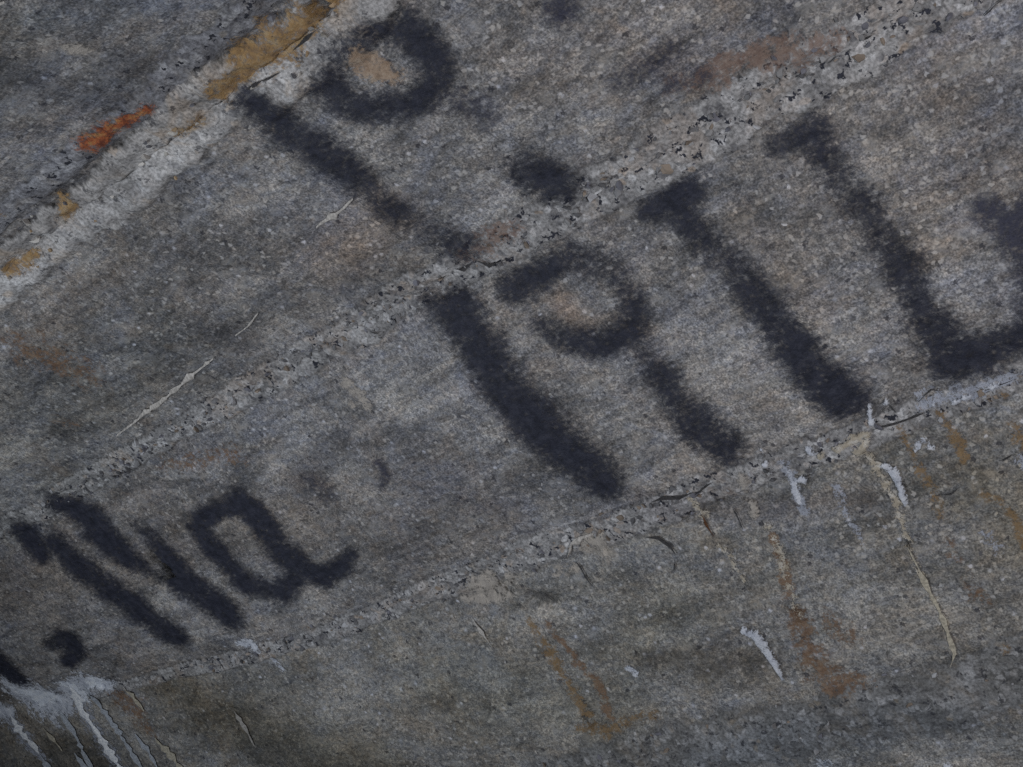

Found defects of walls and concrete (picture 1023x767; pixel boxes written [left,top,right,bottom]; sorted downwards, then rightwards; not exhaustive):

corrosion [203,0,345,103]
corrosion [73,103,155,153]
corrosion [768,533,866,696]
leakage [0,671,182,767]